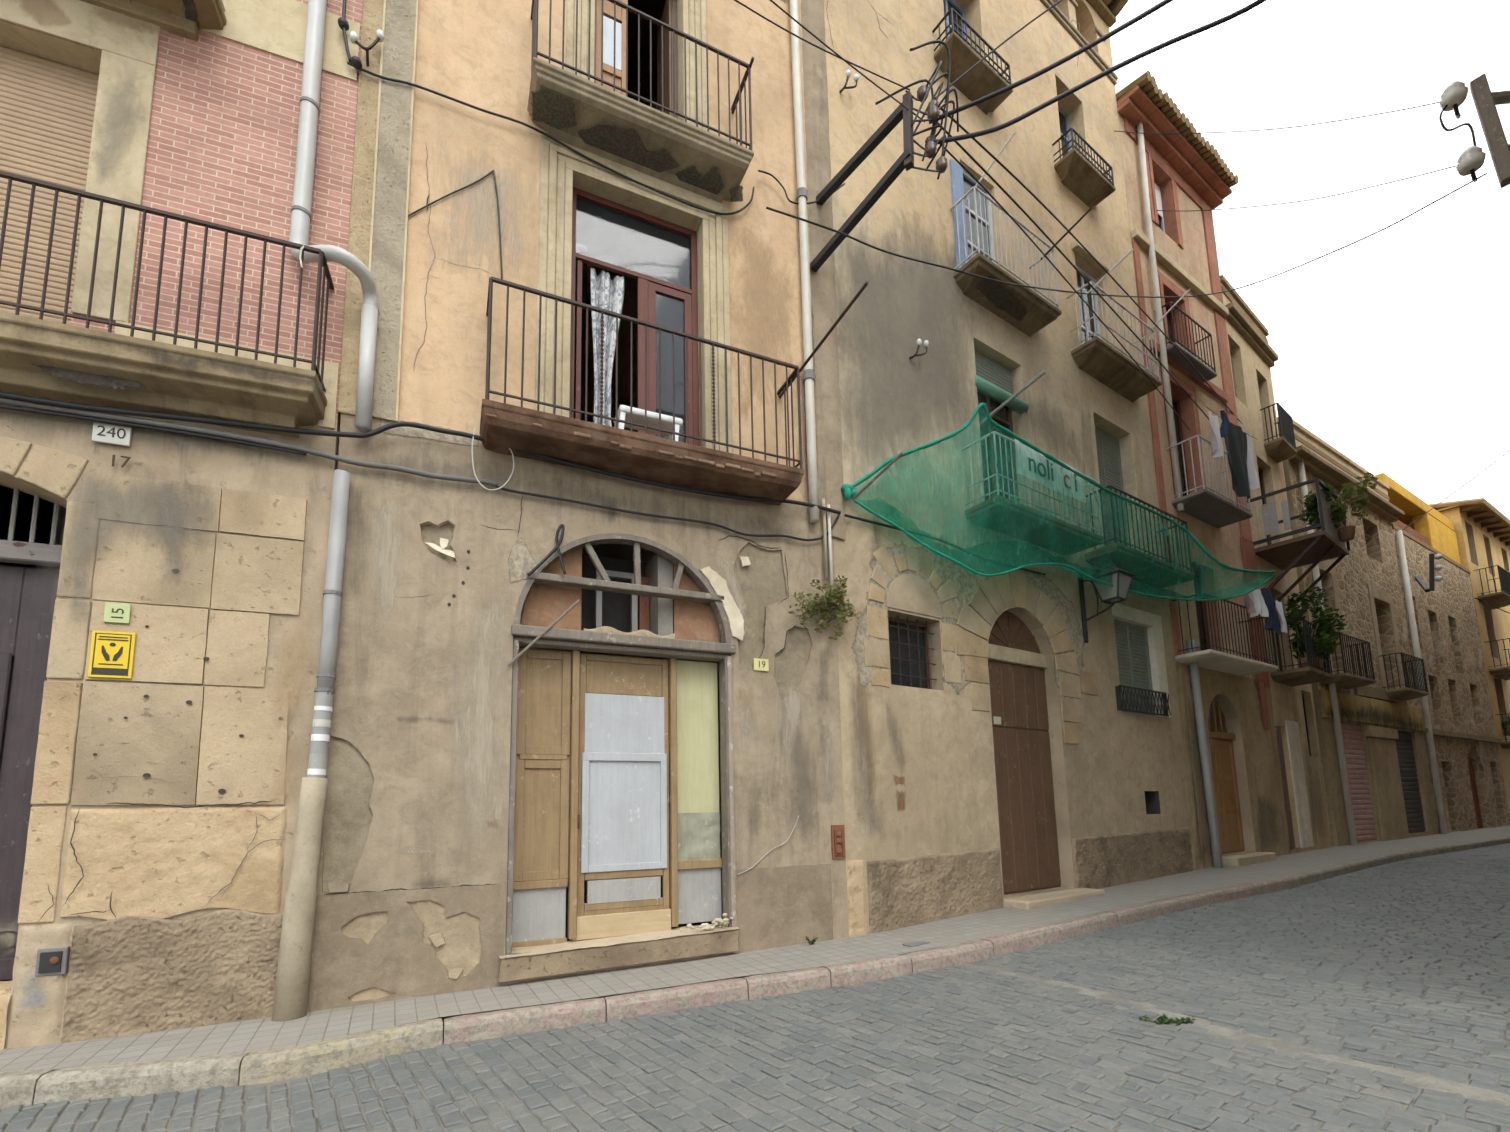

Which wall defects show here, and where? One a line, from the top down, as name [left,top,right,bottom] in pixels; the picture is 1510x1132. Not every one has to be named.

damp [182,0,199,27]
peeling [531,89,743,202]
spalling [420,520,457,562]
spalling [720,542,812,701]
crack [41,808,116,918]
crack [207,808,286,904]
spalling [341,911,389,944]
spalling [407,900,482,979]